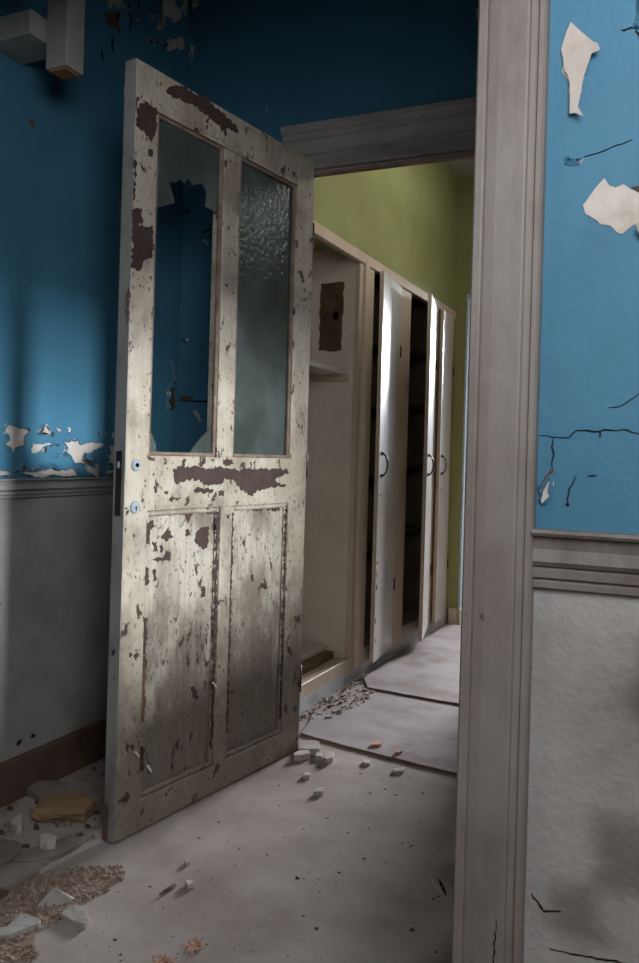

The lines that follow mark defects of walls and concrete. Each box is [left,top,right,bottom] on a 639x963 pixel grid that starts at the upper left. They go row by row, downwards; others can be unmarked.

peeling [155,0,202,69]
peeling [621,0,639,36]
peeling [561,22,600,116]
peeling [564,139,632,166]
peeling [583,178,639,234]
crack [538,393,639,438]
peeling [0,422,115,478]
crack [567,474,597,504]
crack [491,922,499,963]
crack [549,948,622,963]